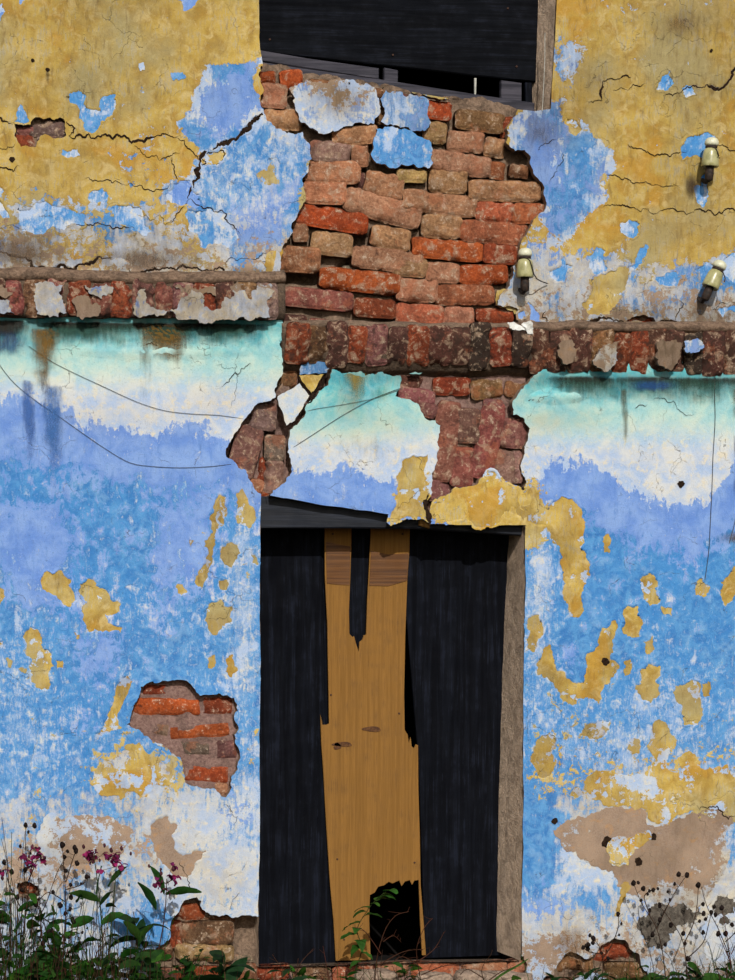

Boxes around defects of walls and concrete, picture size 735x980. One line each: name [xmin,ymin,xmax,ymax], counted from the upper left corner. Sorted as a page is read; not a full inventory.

crack [590,74,643,103]
crack [664,65,735,96]
crack [0,112,267,272]
flaking render [259,63,544,323]
crack [607,174,735,216]
damp [45,322,254,341]
damp [23,383,34,438]
damp [46,388,60,450]
flaking render [173,361,329,637]
peeling [524,570,713,729]
flaking render [90,673,239,800]
peeling [553,718,735,965]